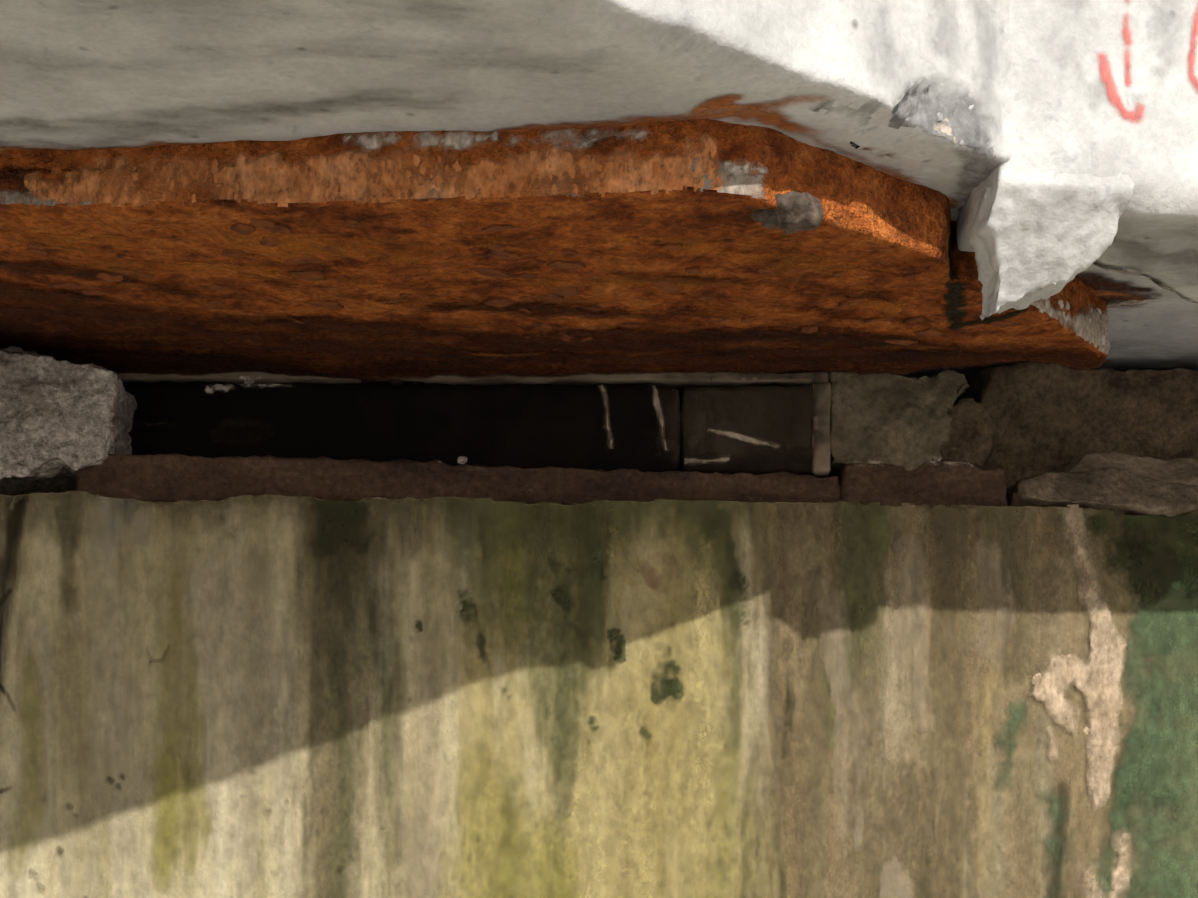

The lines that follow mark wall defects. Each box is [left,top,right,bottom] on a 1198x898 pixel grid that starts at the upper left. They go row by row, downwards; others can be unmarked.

corrosion [24,95,809,207]
corrosion [0,262,1160,385]
crack [0,495,23,638]
water stain [0,491,143,545]
water stain [288,496,431,898]
water stain [726,501,1198,898]